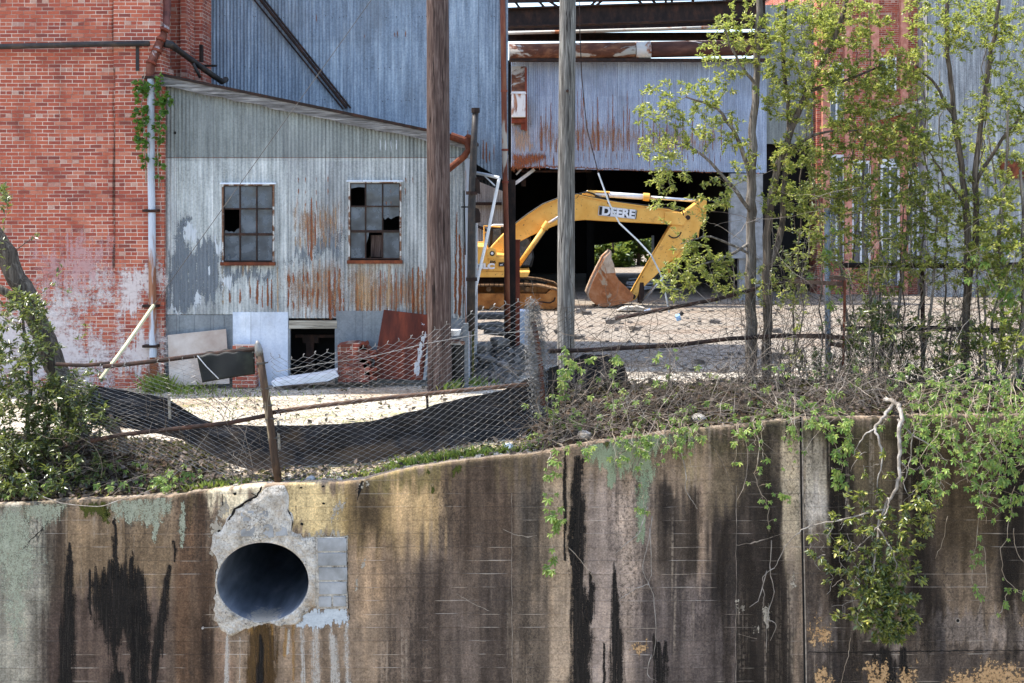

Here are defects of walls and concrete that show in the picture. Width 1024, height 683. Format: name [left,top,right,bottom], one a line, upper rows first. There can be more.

corrosion [510,106,558,170]
corrosion [575,90,733,173]
peeling [166,216,346,314]
corrosion [287,178,428,380]
spalling [210,492,236,537]
crack [222,486,262,541]
water stain [58,518,177,683]
water stain [562,451,626,683]
water stain [652,634,670,683]